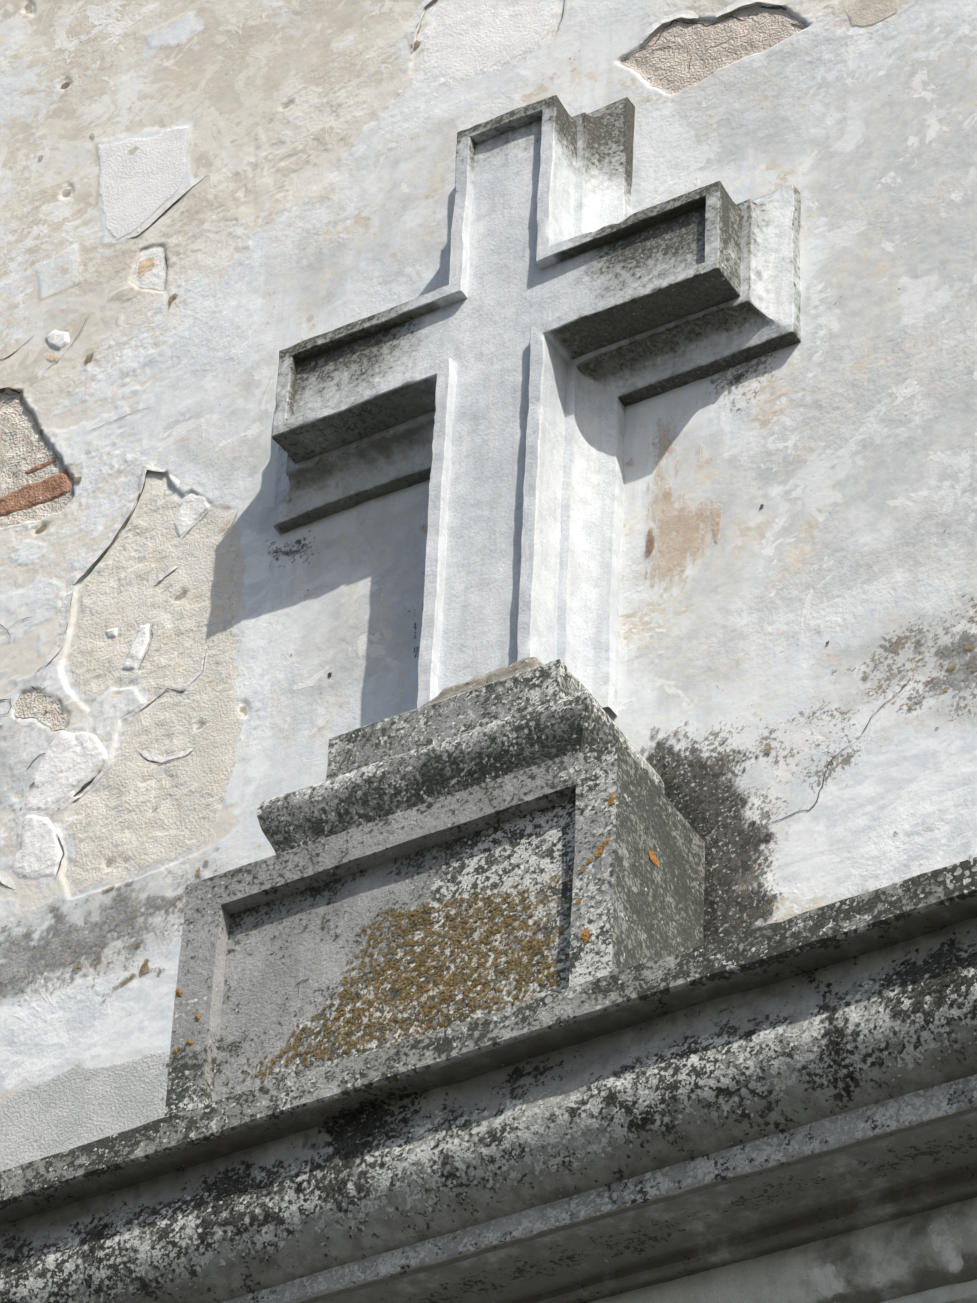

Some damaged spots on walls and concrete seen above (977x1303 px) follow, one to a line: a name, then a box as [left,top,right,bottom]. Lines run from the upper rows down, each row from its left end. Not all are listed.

flaking render [619,0,808,94]
flaking render [0,387,82,533]
flaking render [0,461,247,890]
crack [763,677,915,827]
damp [641,727,783,944]
damp [506,1058,567,1099]
damp [807,961,868,1120]
damp [172,1078,464,1259]
damp [0,1230,36,1295]
damp [67,1201,139,1293]
damp [803,1264,845,1297]
damp [932,1219,963,1271]